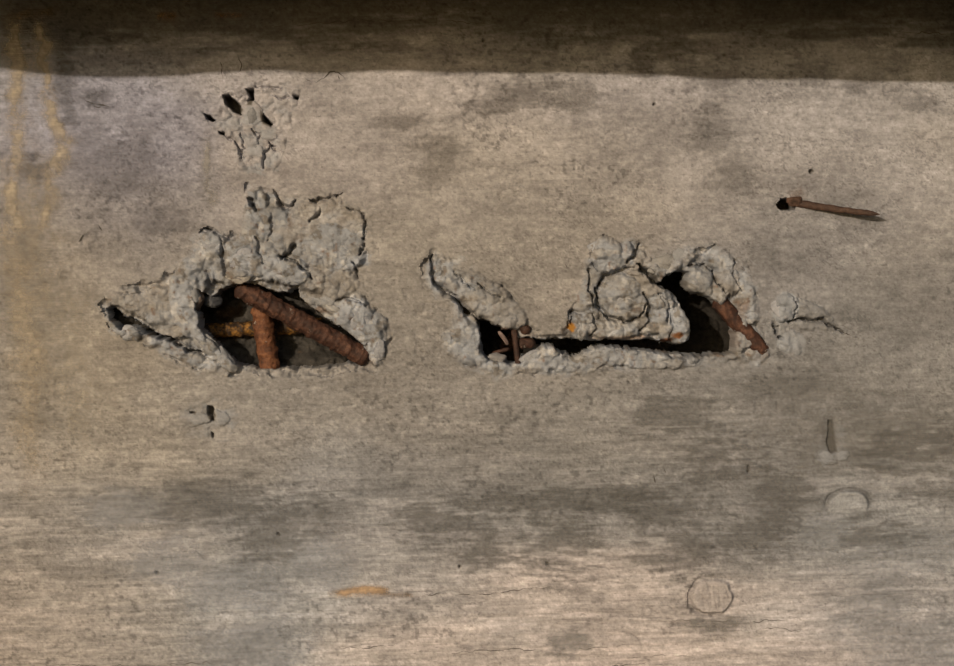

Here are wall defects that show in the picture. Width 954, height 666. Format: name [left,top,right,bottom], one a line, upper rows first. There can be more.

spalling [95,78,396,382]
spalling [417,230,852,383]
corrosion [786,196,802,207]